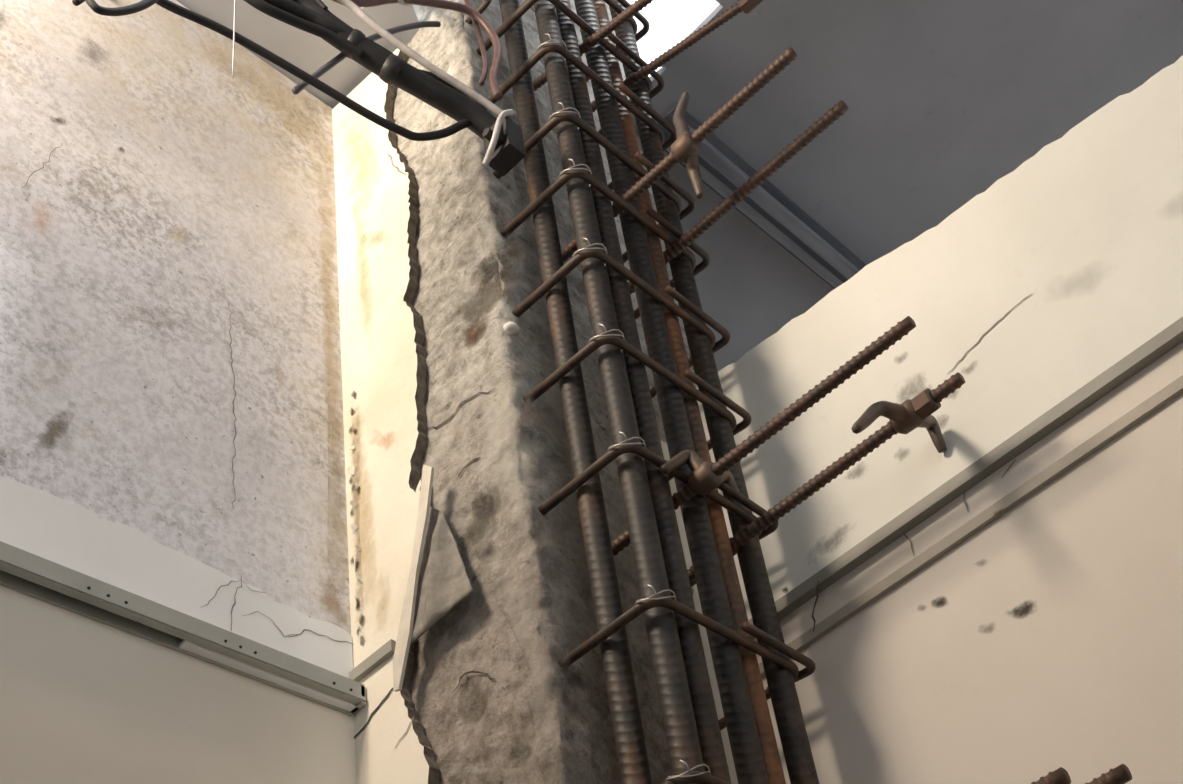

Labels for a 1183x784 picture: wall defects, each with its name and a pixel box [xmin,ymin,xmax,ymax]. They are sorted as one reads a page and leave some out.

crack [228,304,237,509]
spalling [457,0,819,784]
crack [947,294,1032,374]
crack [202,576,354,645]